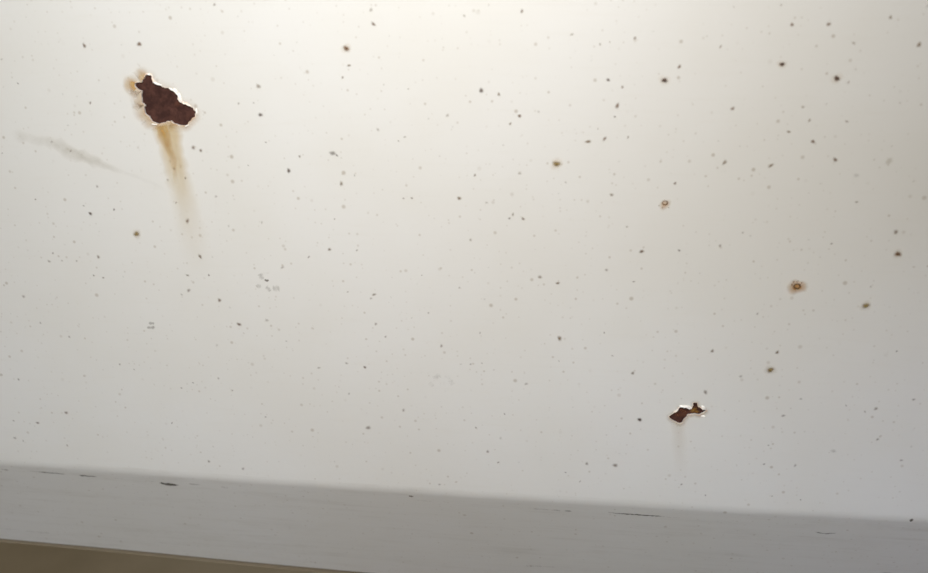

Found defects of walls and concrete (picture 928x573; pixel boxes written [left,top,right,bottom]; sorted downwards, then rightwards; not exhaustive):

corrosion [129,73,198,135]